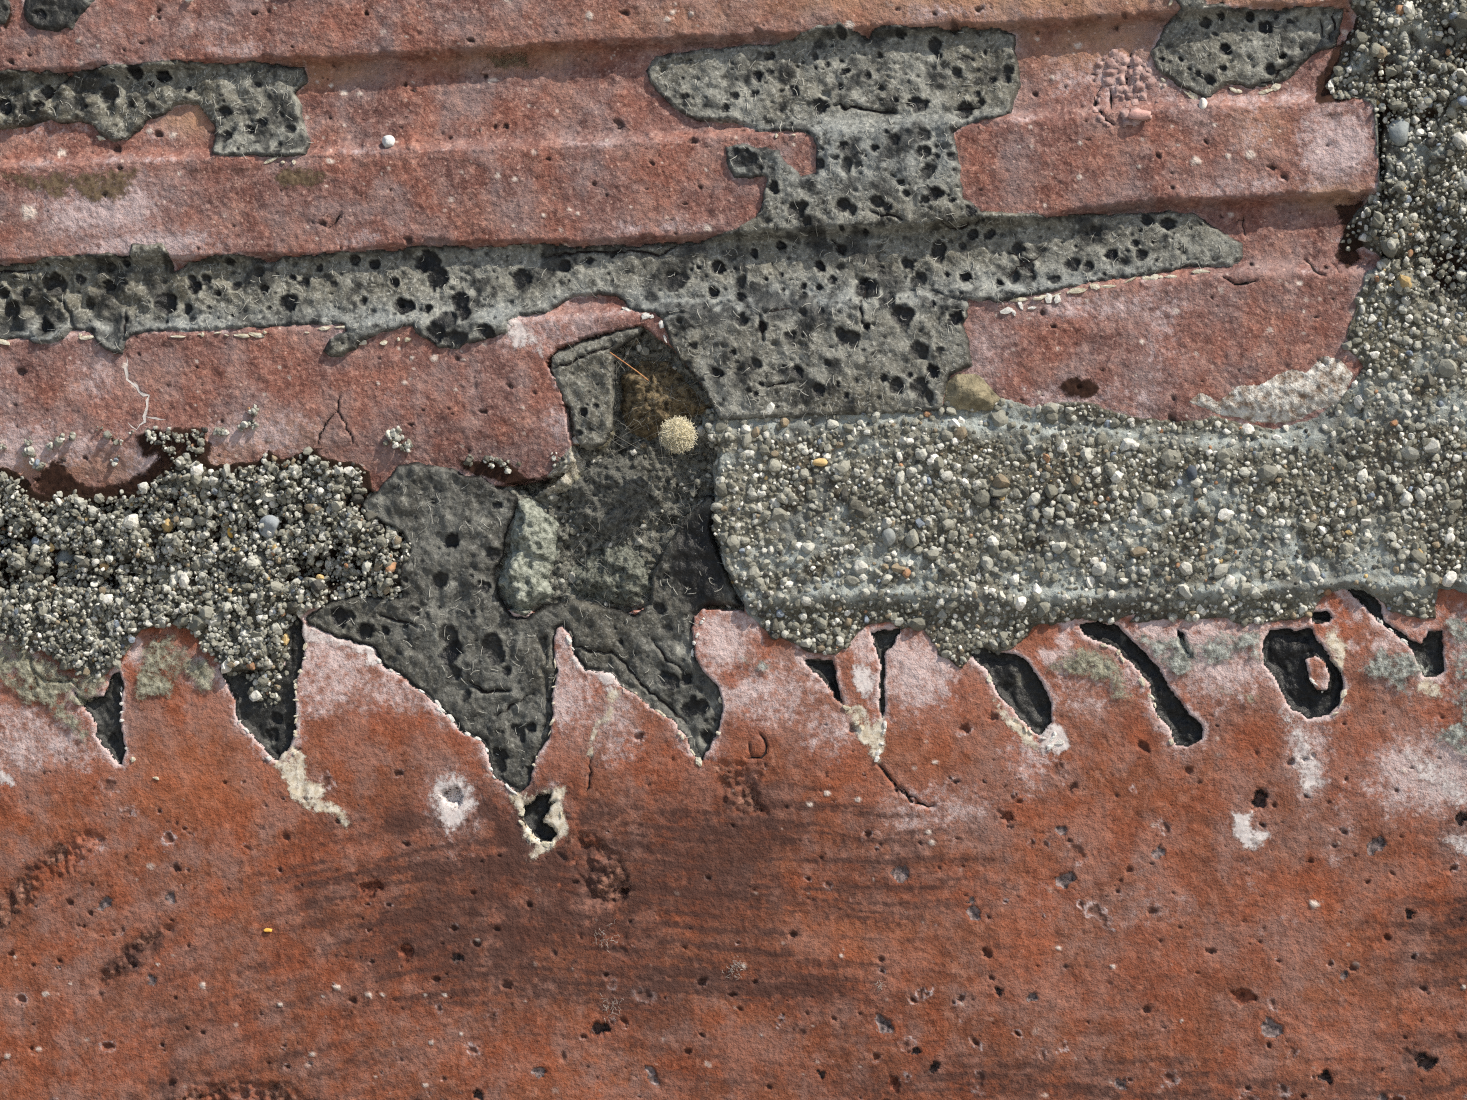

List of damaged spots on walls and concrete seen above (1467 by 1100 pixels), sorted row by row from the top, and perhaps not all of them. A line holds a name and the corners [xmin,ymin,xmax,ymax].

peeling [1093,0,1344,127]
peeling [0,21,1243,448]
crack [124,360,166,430]
peeling [75,672,136,764]
peeling [219,462,762,900]
peeling [971,647,1064,750]
peeling [1080,621,1202,746]
peeling [1262,611,1347,718]
water stain [1418,677,1442,697]
water stain [0,770,15,787]
water stain [1406,749,1467,810]
water stain [1439,835,1467,855]